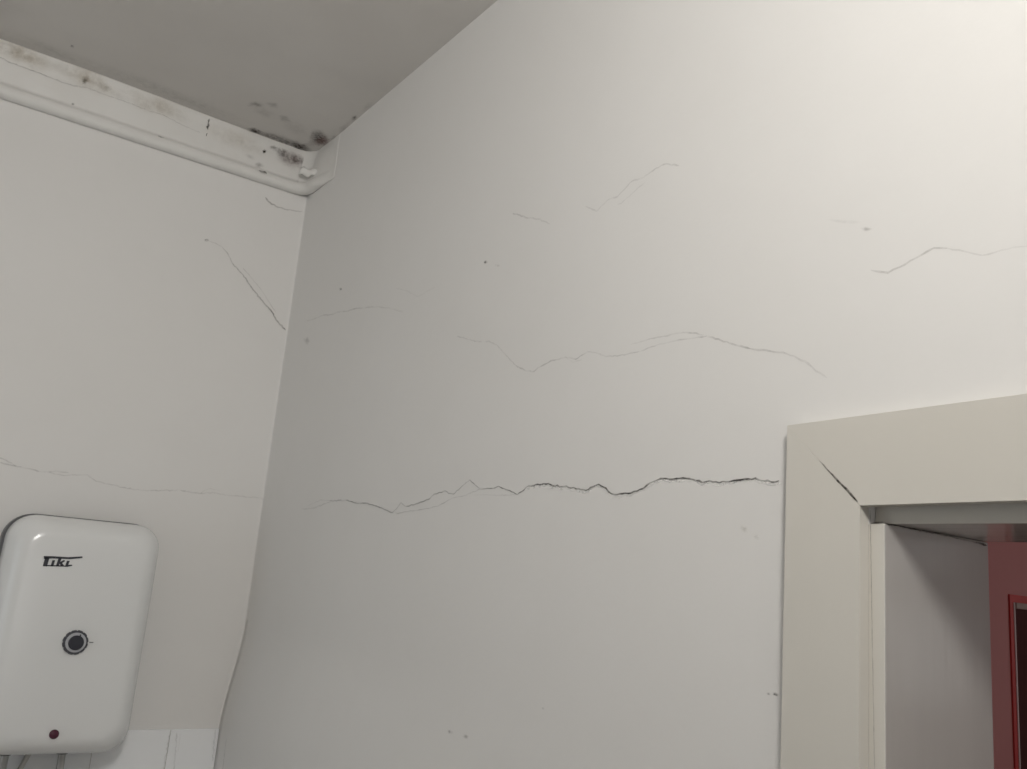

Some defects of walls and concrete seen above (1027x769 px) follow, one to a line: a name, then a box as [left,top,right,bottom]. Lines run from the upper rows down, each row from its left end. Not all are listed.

crack [500,477,779,495]